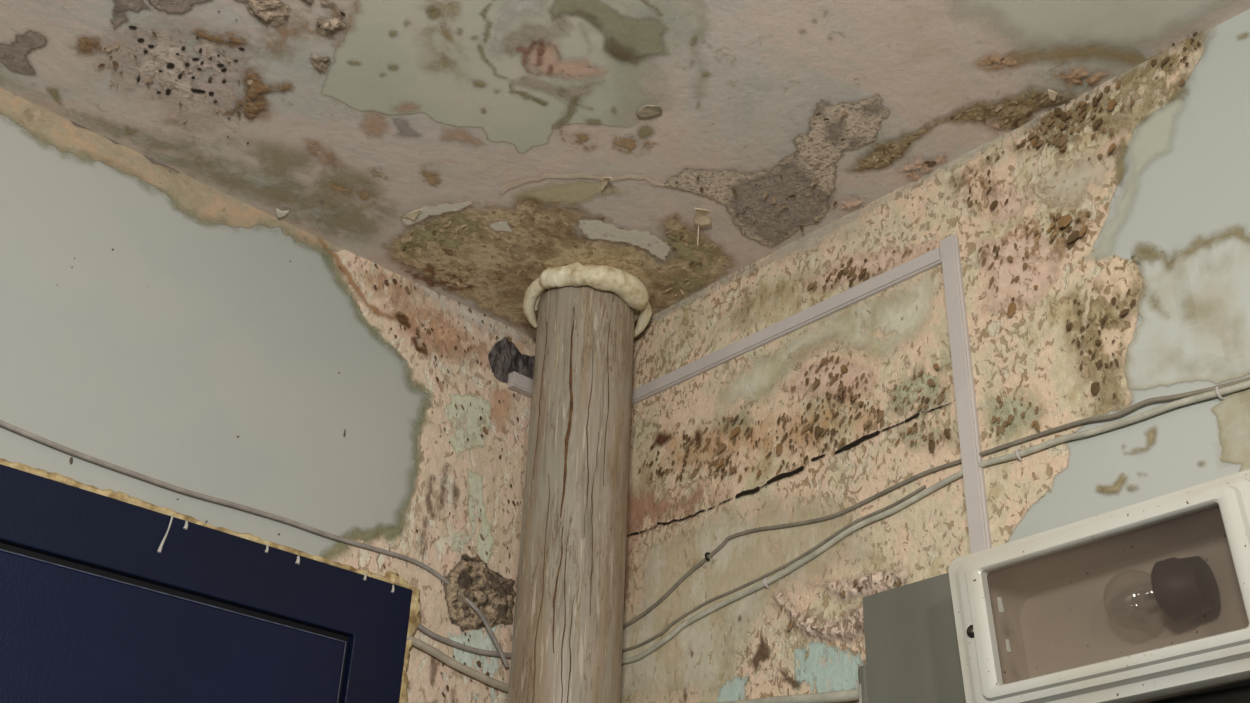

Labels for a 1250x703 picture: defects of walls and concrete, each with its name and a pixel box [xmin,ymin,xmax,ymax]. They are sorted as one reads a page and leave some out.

flaking render [0,30,47,75]
flaking render [78,0,347,141]
water stain [427,0,666,128]
water stain [852,31,1201,203]
water stain [388,181,731,328]
water stain [1001,215,1085,256]
peeling [0,88,536,703]
peeling [499,30,1208,703]
water stain [1073,227,1250,472]
crack [627,402,952,537]
water stain [1097,474,1135,493]